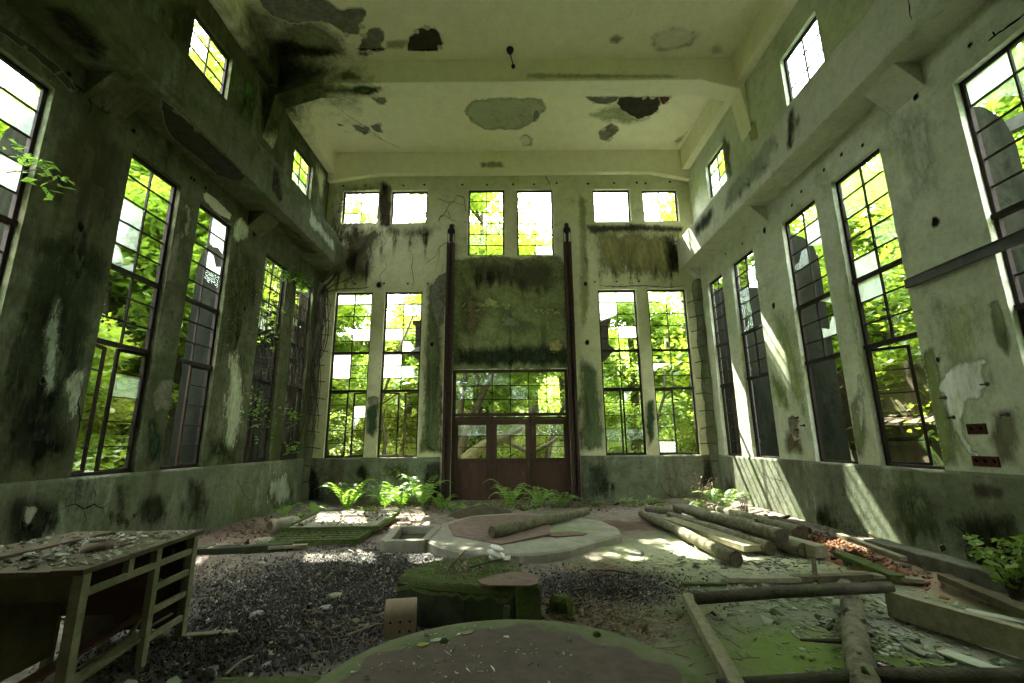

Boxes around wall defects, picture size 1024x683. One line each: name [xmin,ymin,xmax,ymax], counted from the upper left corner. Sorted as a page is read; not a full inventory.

damp [278,24,377,94]
spalling [406,24,444,52]
flaking render [598,123,619,142]
spalling [585,95,672,119]
damp [309,183,432,282]
damp [580,198,682,317]
damp [420,255,568,499]
crack [65,487,107,525]